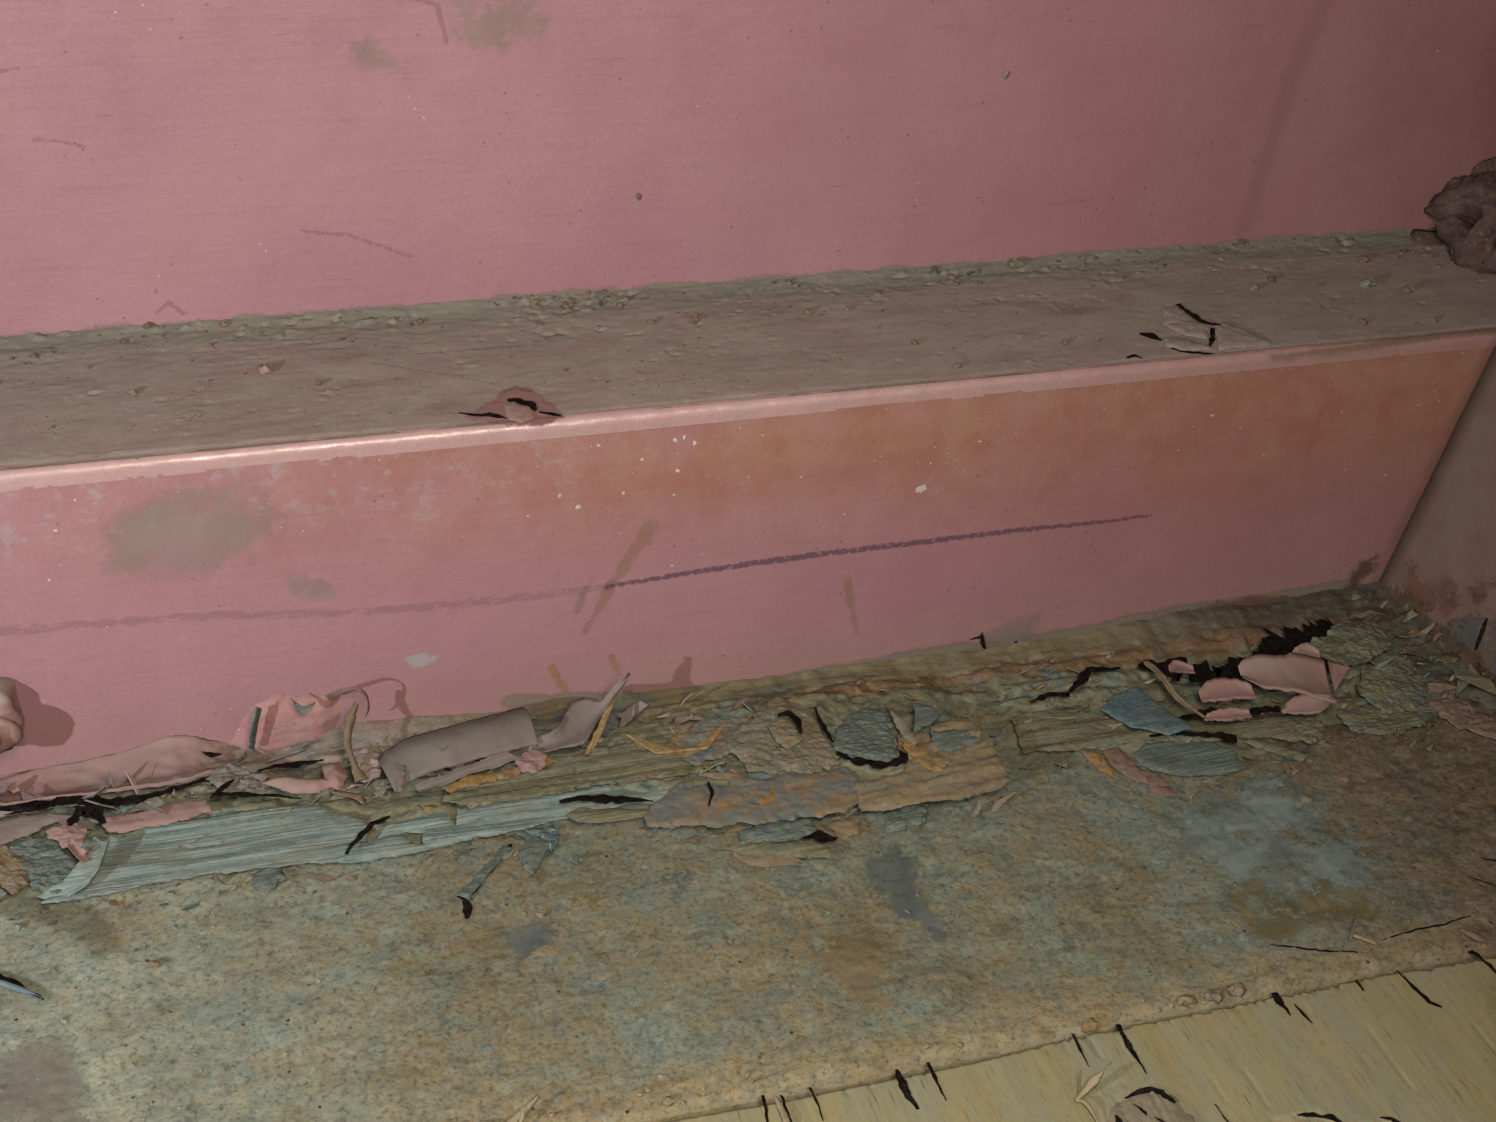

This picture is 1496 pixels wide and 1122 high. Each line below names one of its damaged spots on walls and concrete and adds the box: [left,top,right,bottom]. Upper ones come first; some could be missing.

peeling [46,800,212,849]
peeling [263,762,348,794]
peeling [377,672,631,793]
spalling [1030,615,1374,744]